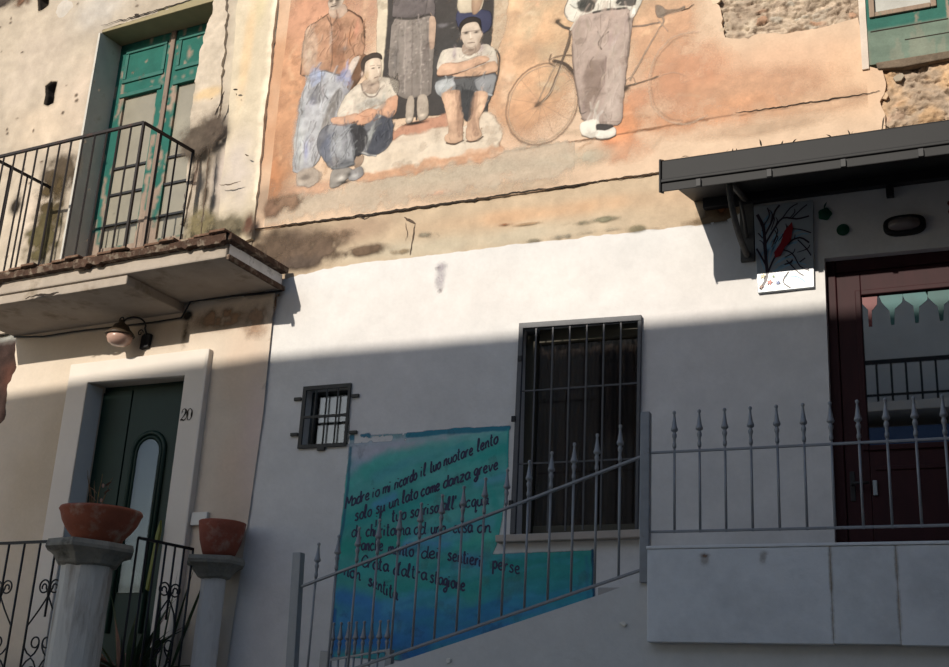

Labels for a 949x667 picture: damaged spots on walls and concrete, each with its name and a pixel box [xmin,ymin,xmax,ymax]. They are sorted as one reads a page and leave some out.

flaking render [711,0,860,39]
flaking render [881,62,949,129]
water stain [179,110,253,237]
water stain [25,156,75,261]
water stain [264,195,298,217]
water stain [254,230,382,269]
water stain [183,308,265,340]